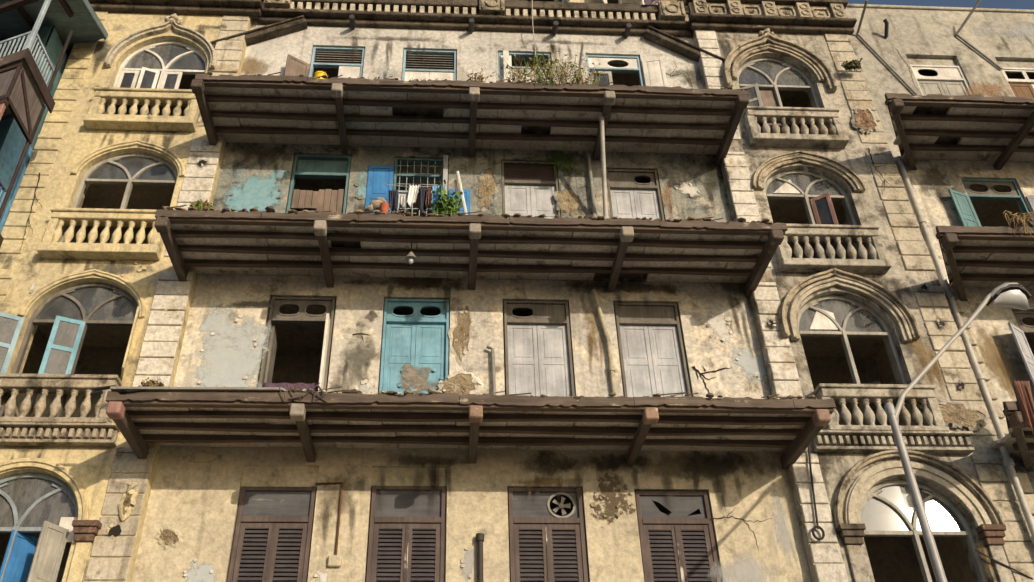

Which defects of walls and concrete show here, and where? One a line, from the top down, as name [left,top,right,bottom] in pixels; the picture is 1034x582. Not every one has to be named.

spalling [851,107,879,134]
water stain [331,322,376,390]
spalling [397,303,484,395]
crack [692,366,732,393]
water stain [527,451,749,500]
flaking render [590,473,636,528]
crack [711,507,771,551]